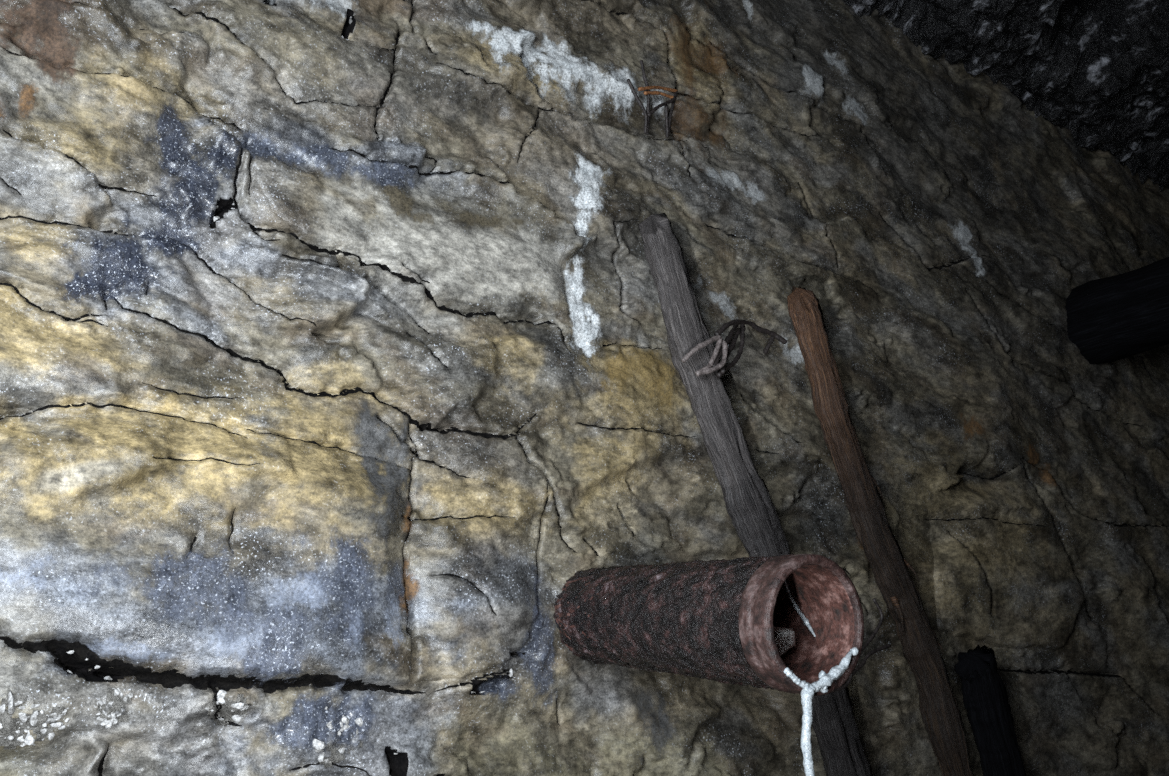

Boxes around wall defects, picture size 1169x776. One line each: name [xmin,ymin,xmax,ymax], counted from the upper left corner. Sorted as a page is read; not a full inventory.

crack [139,0,565,184]
water stain [469,21,664,115]
crack [0,178,145,238]
crack [66,154,156,197]
crack [81,71,570,368]
water stain [563,152,603,357]
crack [0,281,600,583]
crack [577,422,696,438]
crack [434,574,496,615]
crack [0,636,526,726]
crack [98,745,109,776]
crack [290,762,370,776]